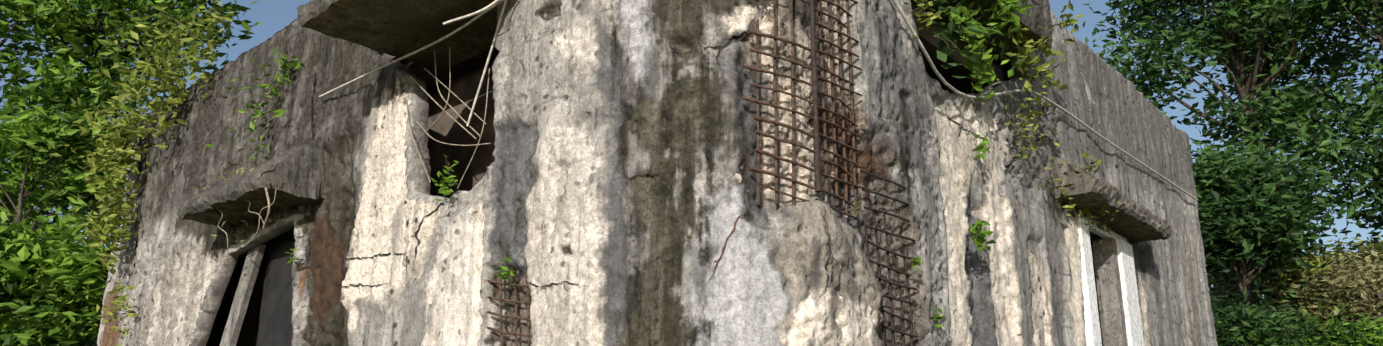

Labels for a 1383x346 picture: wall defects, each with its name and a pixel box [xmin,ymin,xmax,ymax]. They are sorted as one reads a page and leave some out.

rust [297,211,345,333]
crack [340,202,444,294]
peeling [341,74,533,346]
water stain [595,0,774,346]
crack [707,213,749,283]
spalling [689,0,927,346]
rust [809,103,886,191]